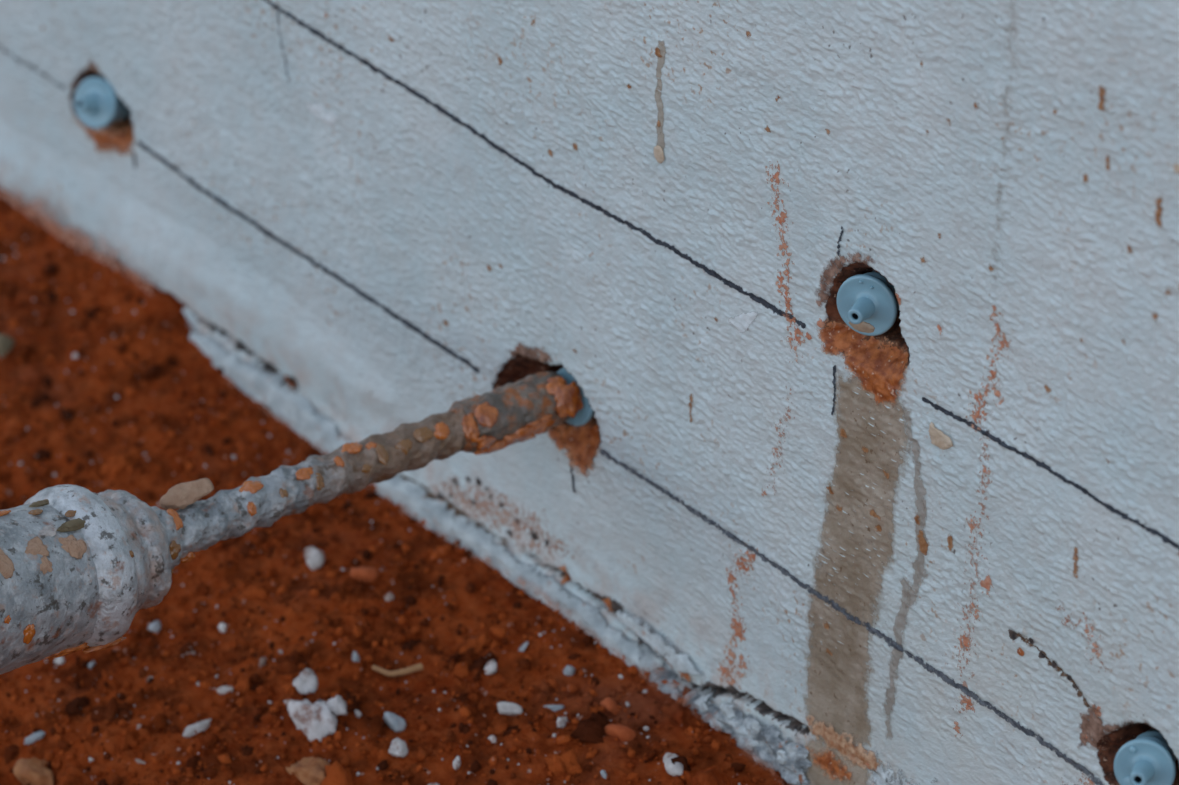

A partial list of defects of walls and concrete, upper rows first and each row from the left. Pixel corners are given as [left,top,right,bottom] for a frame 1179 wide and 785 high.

corrosion [73,118,134,155]
crack [194,311,299,391]
corrosion [818,321,909,405]
corrosion [548,416,601,476]
damp [953,295,1011,737]
crack [400,475,810,736]
damp [804,376,928,785]
crack [1008,629,1096,710]